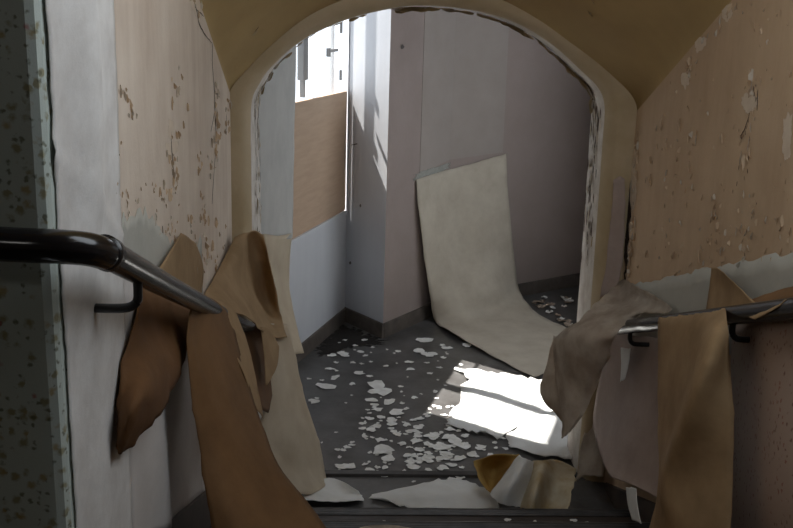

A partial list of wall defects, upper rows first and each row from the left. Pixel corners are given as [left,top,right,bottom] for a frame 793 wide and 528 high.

peeling [117,74,185,268]
peeling [188,191,227,273]
peeling [393,6,601,266]
peeling [632,184,793,319]